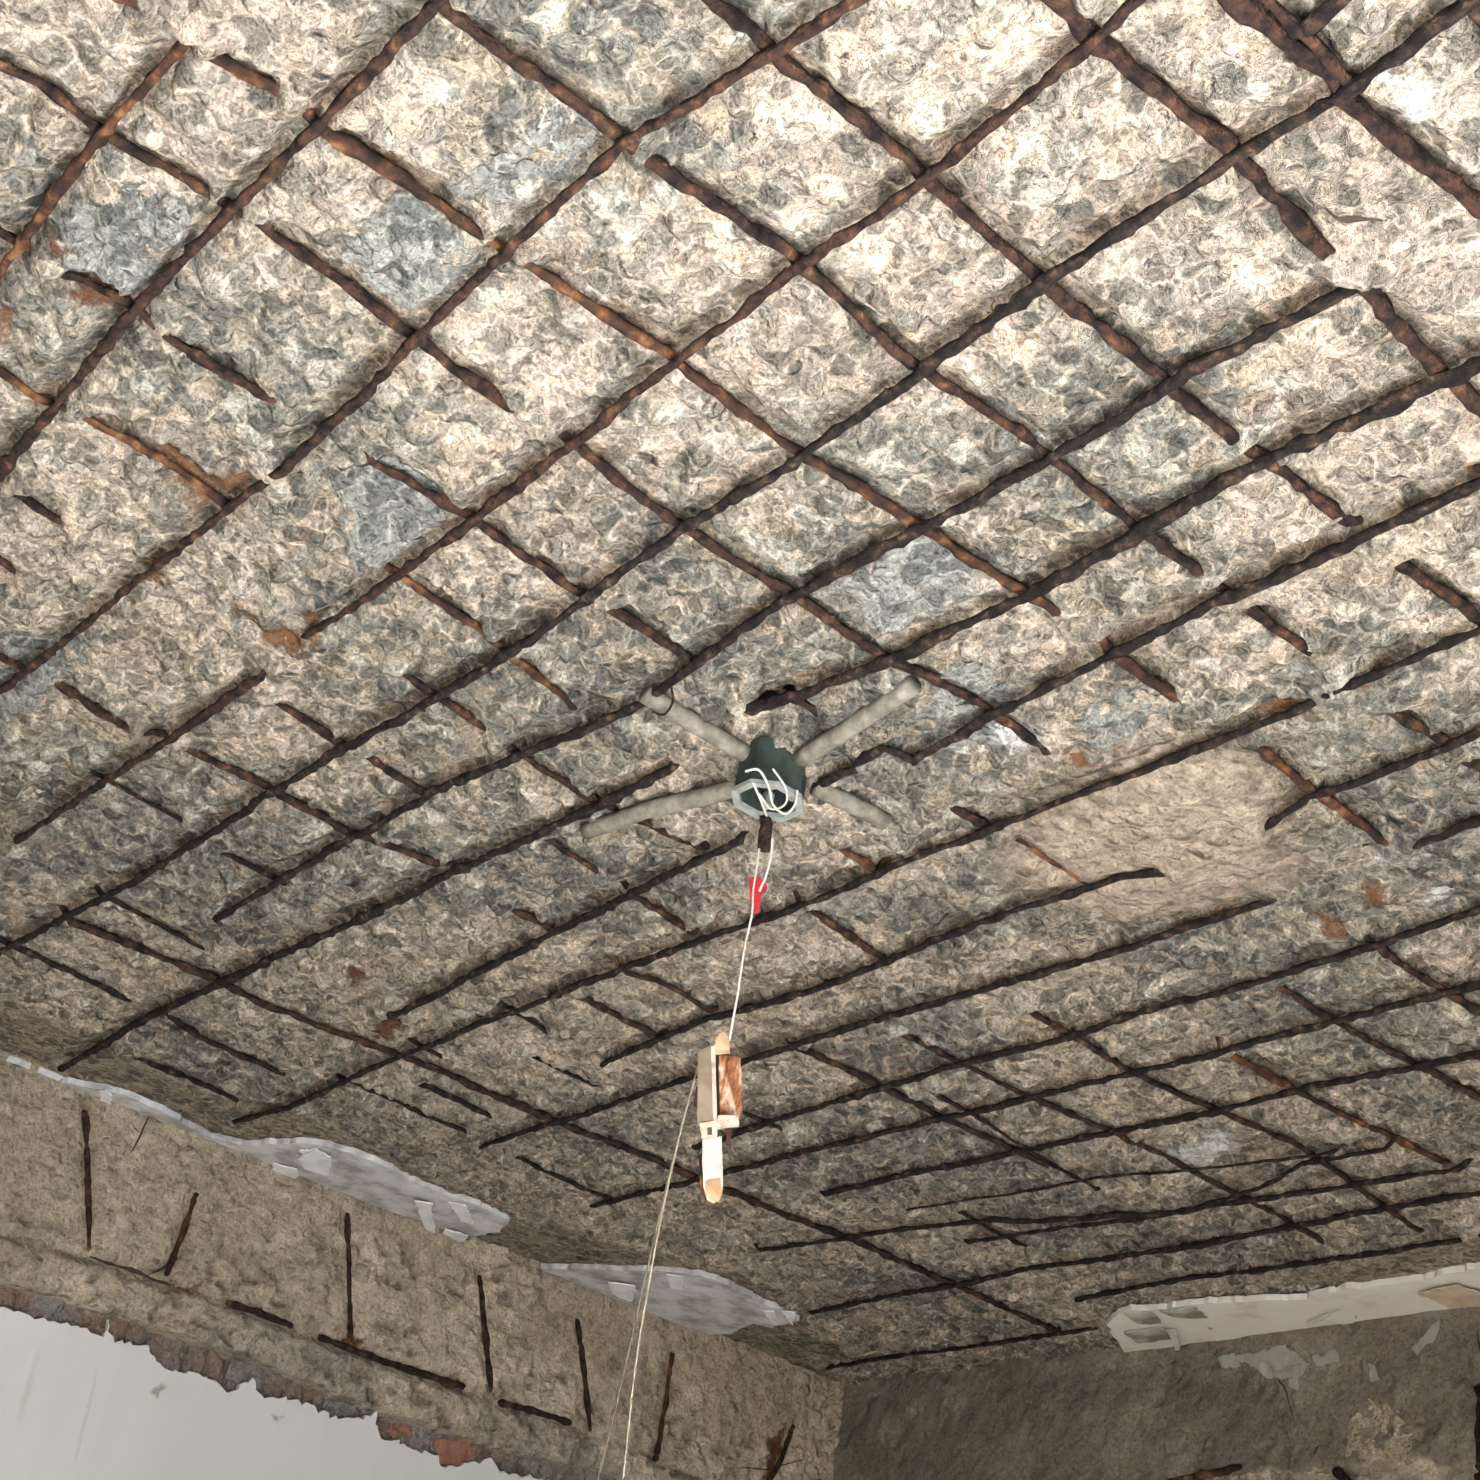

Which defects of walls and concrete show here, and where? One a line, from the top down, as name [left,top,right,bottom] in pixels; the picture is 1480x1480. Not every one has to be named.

spalling [57,183,206,293]
corrosion [71,272,119,306]
corrosion [153,441,251,509]
spalling [333,456,449,575]
spalling [827,517,998,635]
corrosion [234,605,318,658]
spalling [911,659,1027,756]
corrosion [1064,749,1091,770]
corrosion [347,967,365,986]
corrosion [370,1017,408,1041]
peeling [6,1055,510,1242]
peeling [1106,1262,1480,1353]